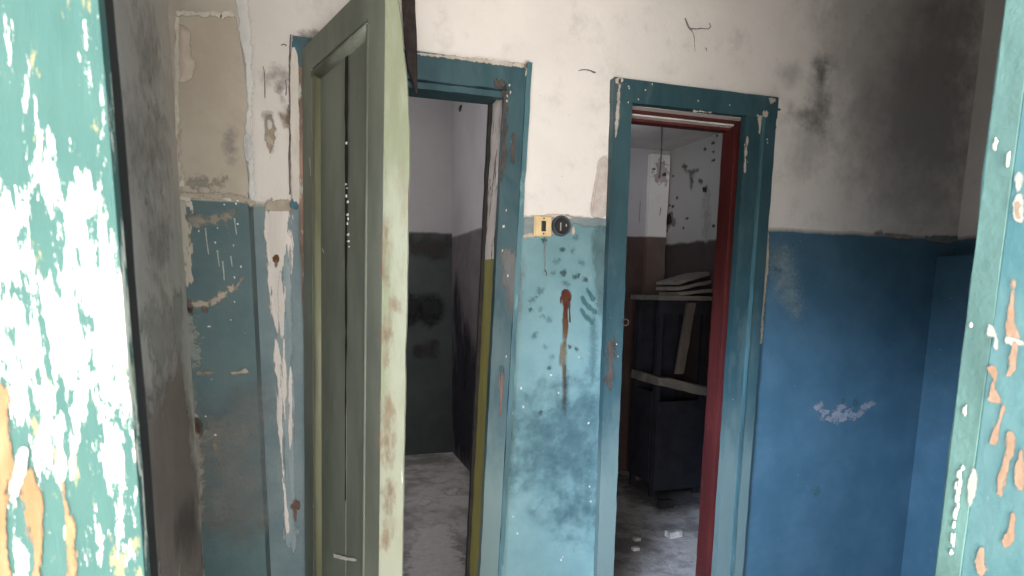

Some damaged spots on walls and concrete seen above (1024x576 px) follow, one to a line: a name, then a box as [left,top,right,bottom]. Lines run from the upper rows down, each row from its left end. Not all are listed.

peeling [992,138,1024,223]
spalling [175,0,300,554]
peeling [0,385,43,576]
peeling [60,474,78,576]
water stain [147,363,204,576]
water stain [529,379,594,477]
rust [560,289,572,400]
peeling [812,401,876,426]
peeling [949,465,978,555]
peeling [975,547,987,576]
peeling [986,279,1024,497]
peeling [1002,512,1016,548]